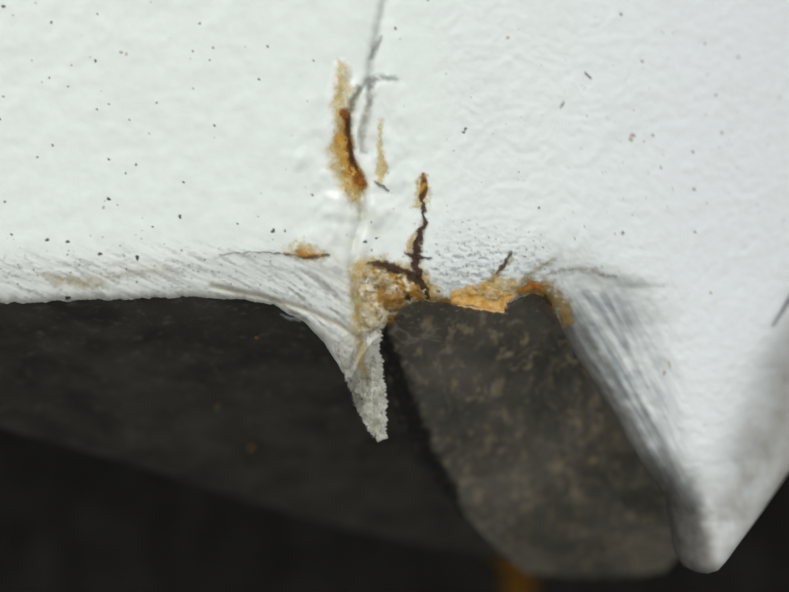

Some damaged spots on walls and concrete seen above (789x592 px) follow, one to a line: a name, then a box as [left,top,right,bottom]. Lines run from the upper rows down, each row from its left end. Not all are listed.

corrosion [329,63,389,200]
corrosion [286,244,325,259]
crack [367,199,431,299]
corrosion [427,251,574,327]
peeling [335,258,438,441]